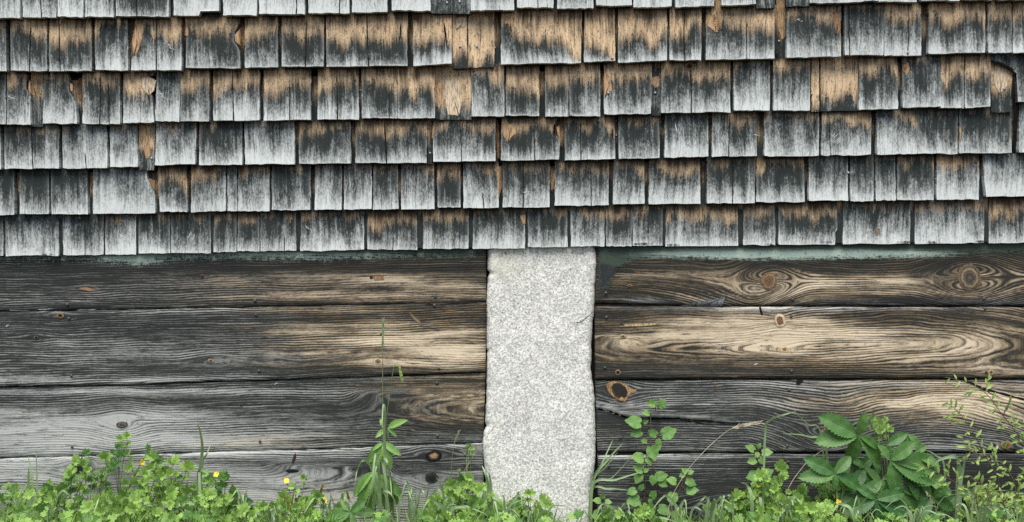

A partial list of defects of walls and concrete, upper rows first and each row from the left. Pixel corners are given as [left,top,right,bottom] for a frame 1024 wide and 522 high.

spalling [132,23,142,55]
spalling [141,76,156,95]